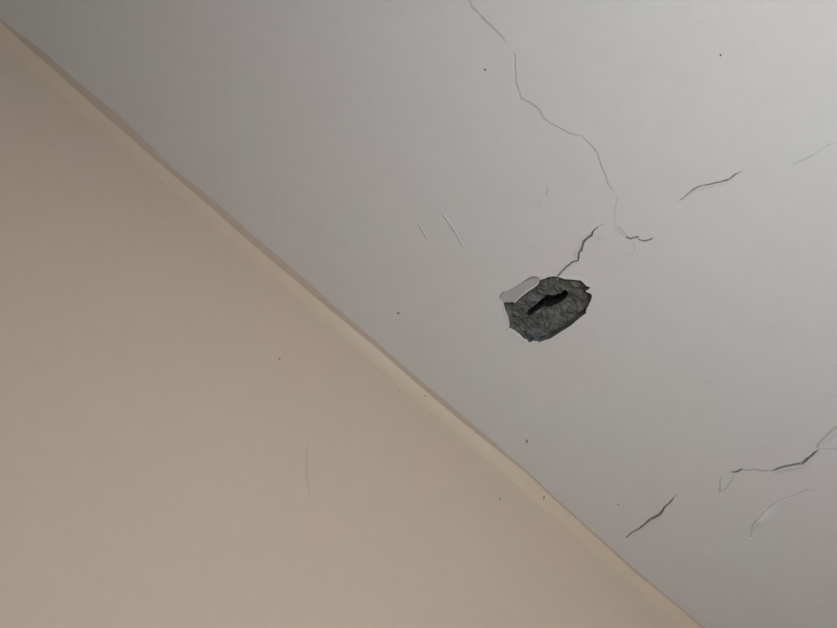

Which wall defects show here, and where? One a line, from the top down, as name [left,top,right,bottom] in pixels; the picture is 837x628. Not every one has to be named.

crack [680,171,741,201]
crack [556,222,653,280]
flaking render [500,275,592,349]
crack [772,428,837,473]
crack [626,497,675,538]